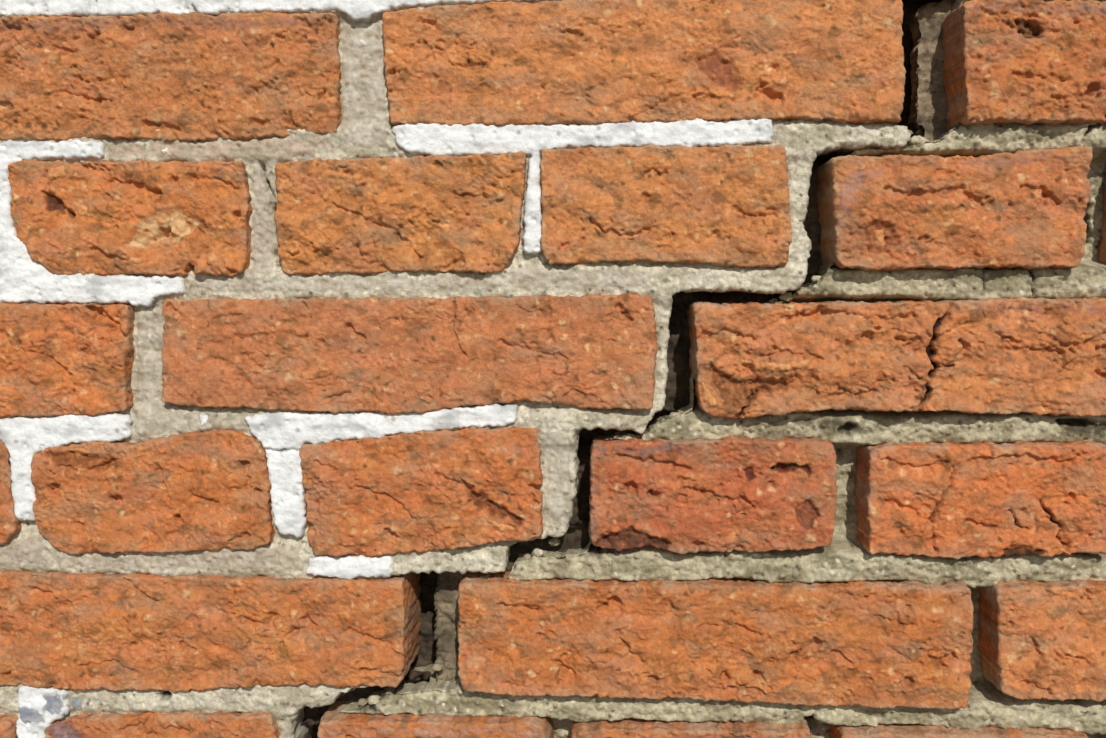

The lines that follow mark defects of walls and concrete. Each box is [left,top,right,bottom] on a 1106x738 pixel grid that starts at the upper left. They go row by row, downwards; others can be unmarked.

crack [894,0,957,147]
crack [505,153,847,572]
crack [920,313,947,404]
crack [301,571,464,738]